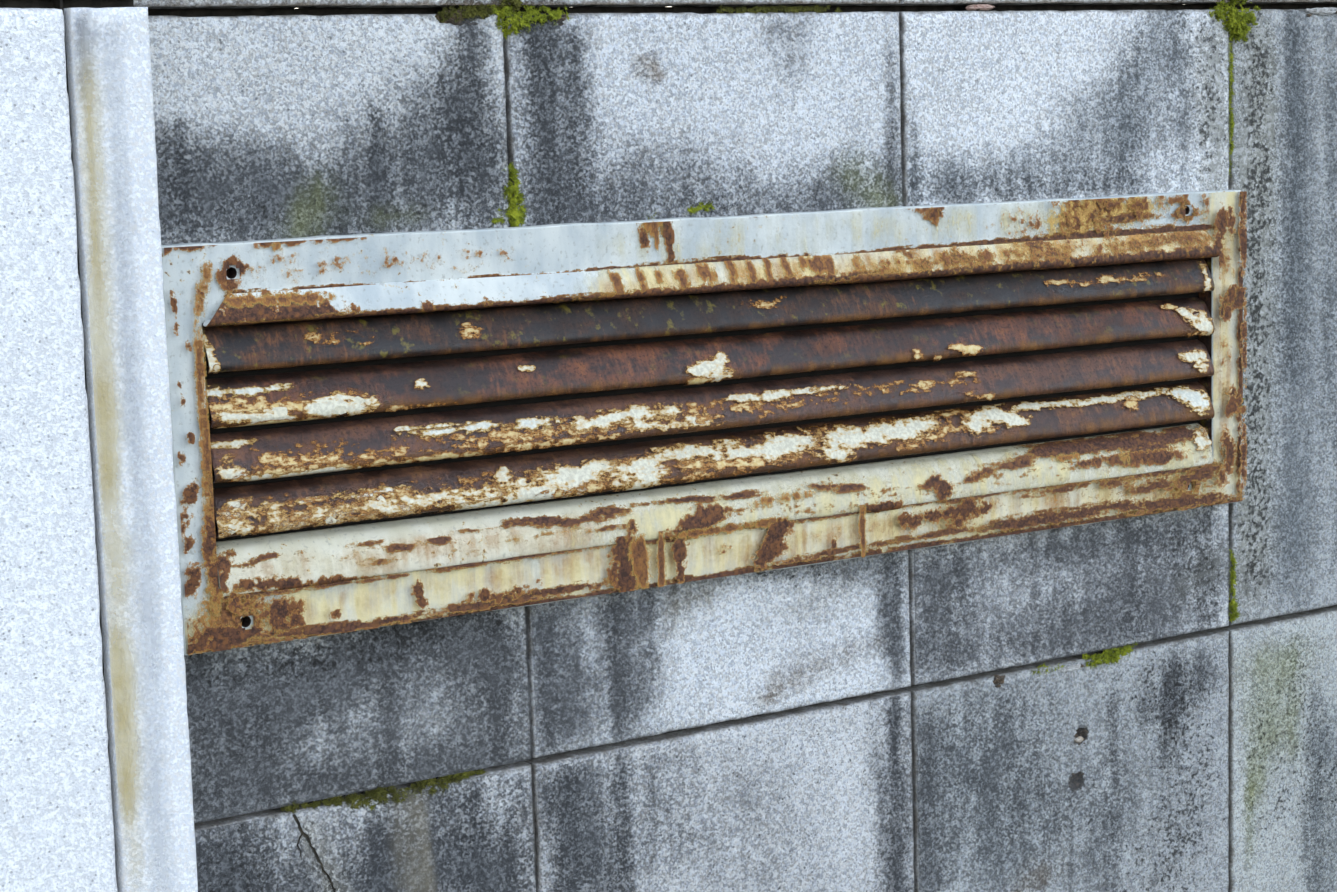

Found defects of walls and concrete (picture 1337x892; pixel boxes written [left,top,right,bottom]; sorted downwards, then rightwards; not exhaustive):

leakage [155,0,505,245]
leakage [516,0,1229,226]
peeling [743,296,787,309]
peeling [1044,272,1170,287]
peeling [1199,261,1212,293]
leakage [1264,15,1315,589]
corrosion [164,191,1247,655]
peeling [203,303,1214,538]
crack [292,814,336,892]
leakage [184,601,592,892]
leakage [538,754,669,892]
leakage [877,697,1025,892]